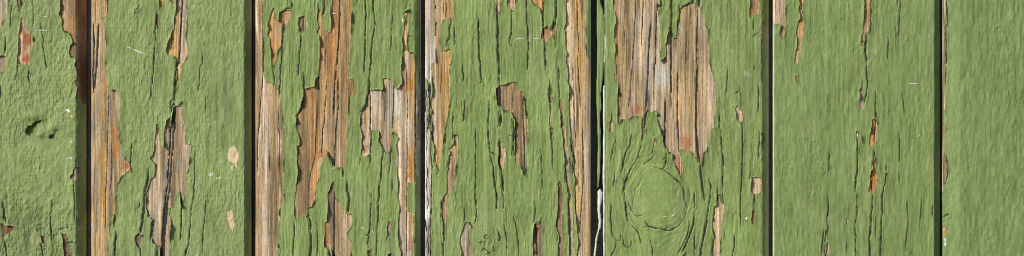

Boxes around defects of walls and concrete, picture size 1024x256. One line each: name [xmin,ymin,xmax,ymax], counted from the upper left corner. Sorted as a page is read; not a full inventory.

peeling [0,0,34,72]
peeling [58,0,130,256]
peeling [136,0,191,256]
peeling [256,0,466,256]
crack [257,0,584,256]
peeling [494,82,528,176]
peeling [530,0,591,256]
peeling [608,0,716,175]
crack [610,0,763,256]
peeling [711,195,724,256]
peeling [748,0,804,81]
peeling [855,118,887,194]